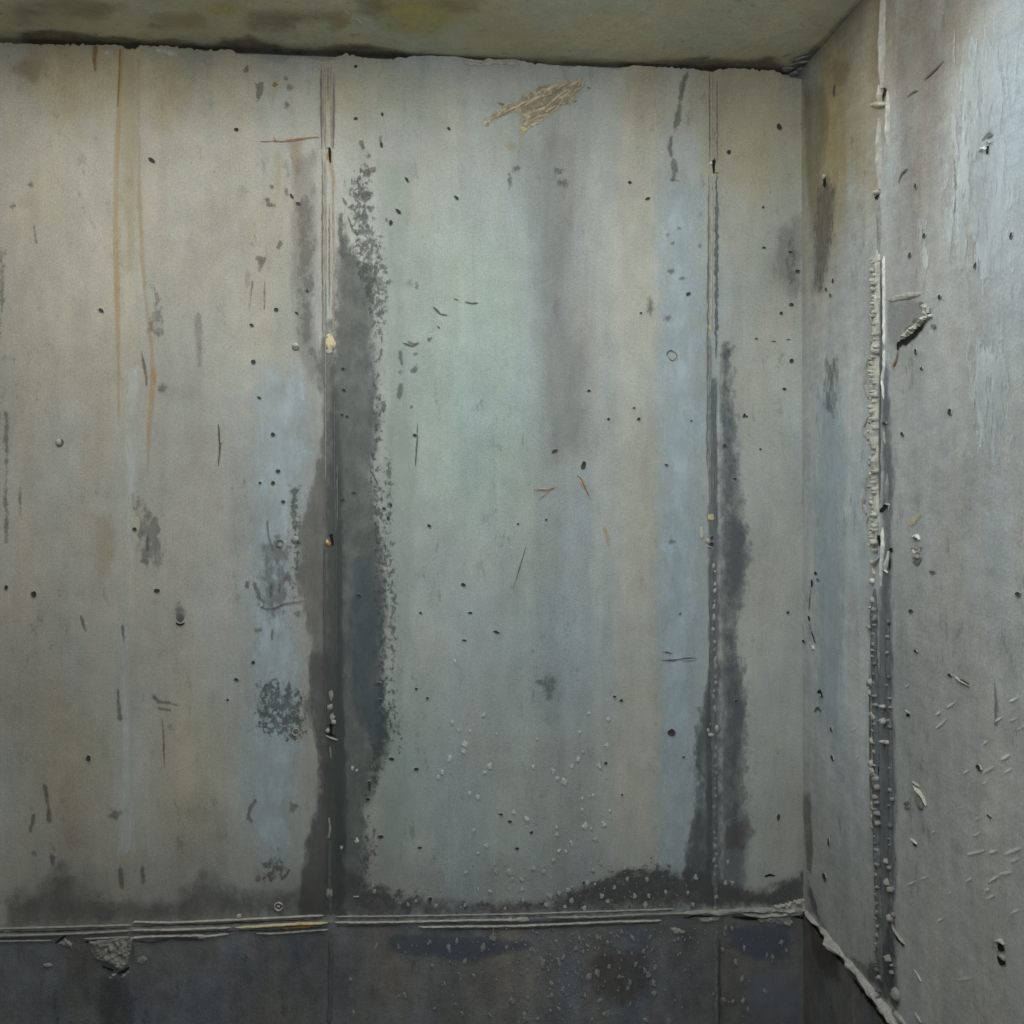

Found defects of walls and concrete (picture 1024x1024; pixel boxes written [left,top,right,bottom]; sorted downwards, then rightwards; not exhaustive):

spalling [482,77,591,133]
spalling [887,292,936,367]
water stain [307,195,817,920]
water stain [245,376,342,851]
spalling [83,938,147,980]
water stain [853,911,895,1007]